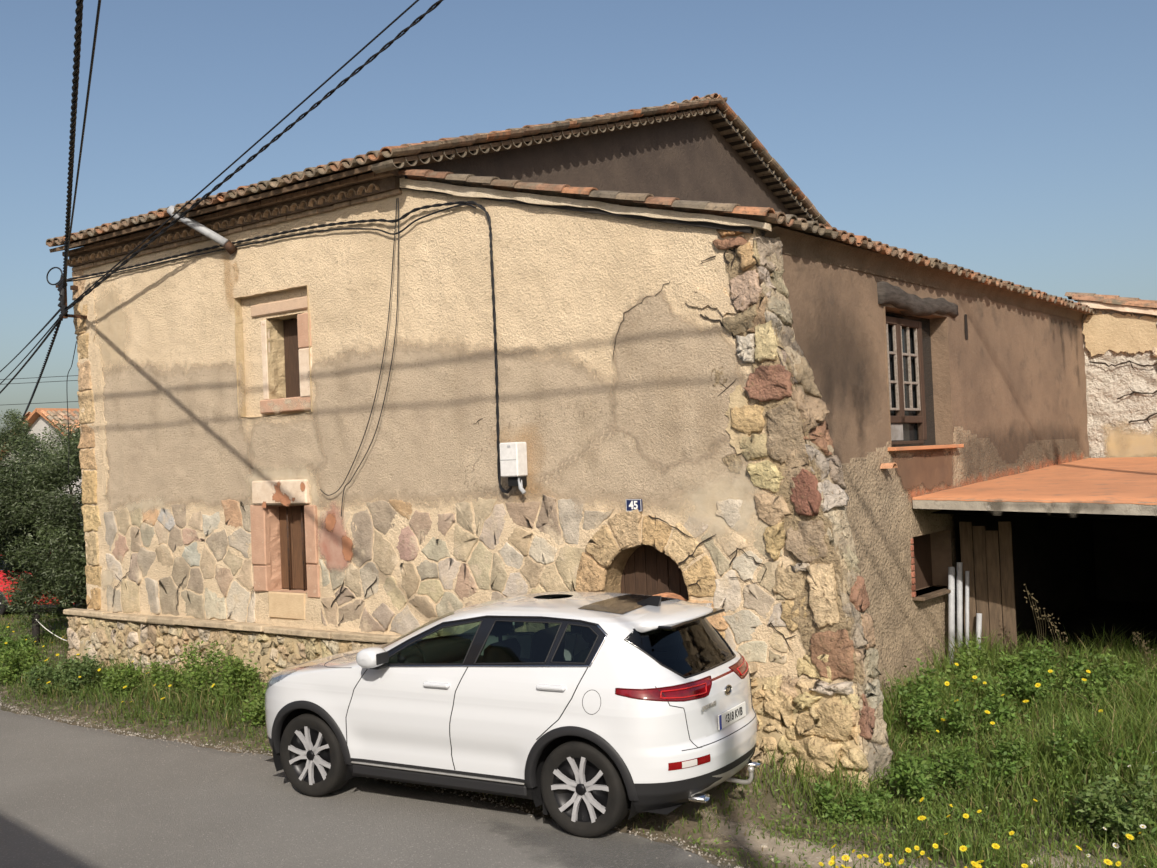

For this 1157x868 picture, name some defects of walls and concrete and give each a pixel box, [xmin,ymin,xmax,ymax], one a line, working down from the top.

crack [613,281,670,358]
crack [700,314,741,338]
spalling [685,253,758,316]
flaking render [1082,312,1157,357]
spalling [711,292,797,474]
spalling [768,455,854,655]